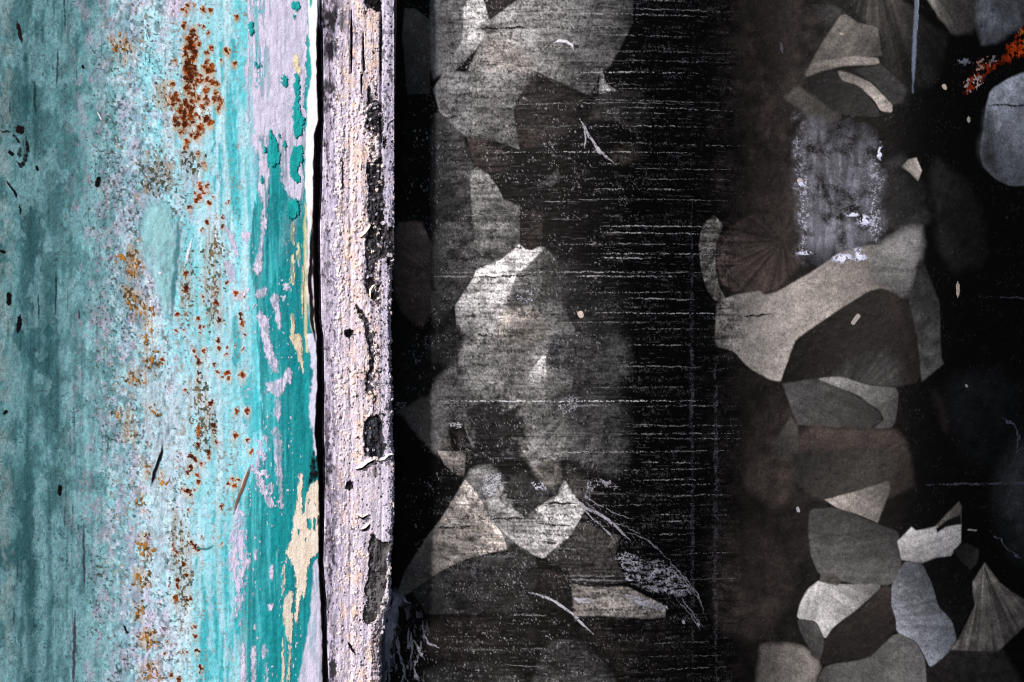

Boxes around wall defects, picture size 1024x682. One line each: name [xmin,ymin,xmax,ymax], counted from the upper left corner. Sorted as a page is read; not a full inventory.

corrosion [957,26,1024,95]
corrosion [114,249,165,386]
corrosion [138,2,246,678]
peeling [224,0,324,682]
spalling [344,88,394,482]
corrosion [110,404,168,441]
corrosion [231,432,253,455]
corrosion [131,495,182,682]
spalling [356,513,393,666]